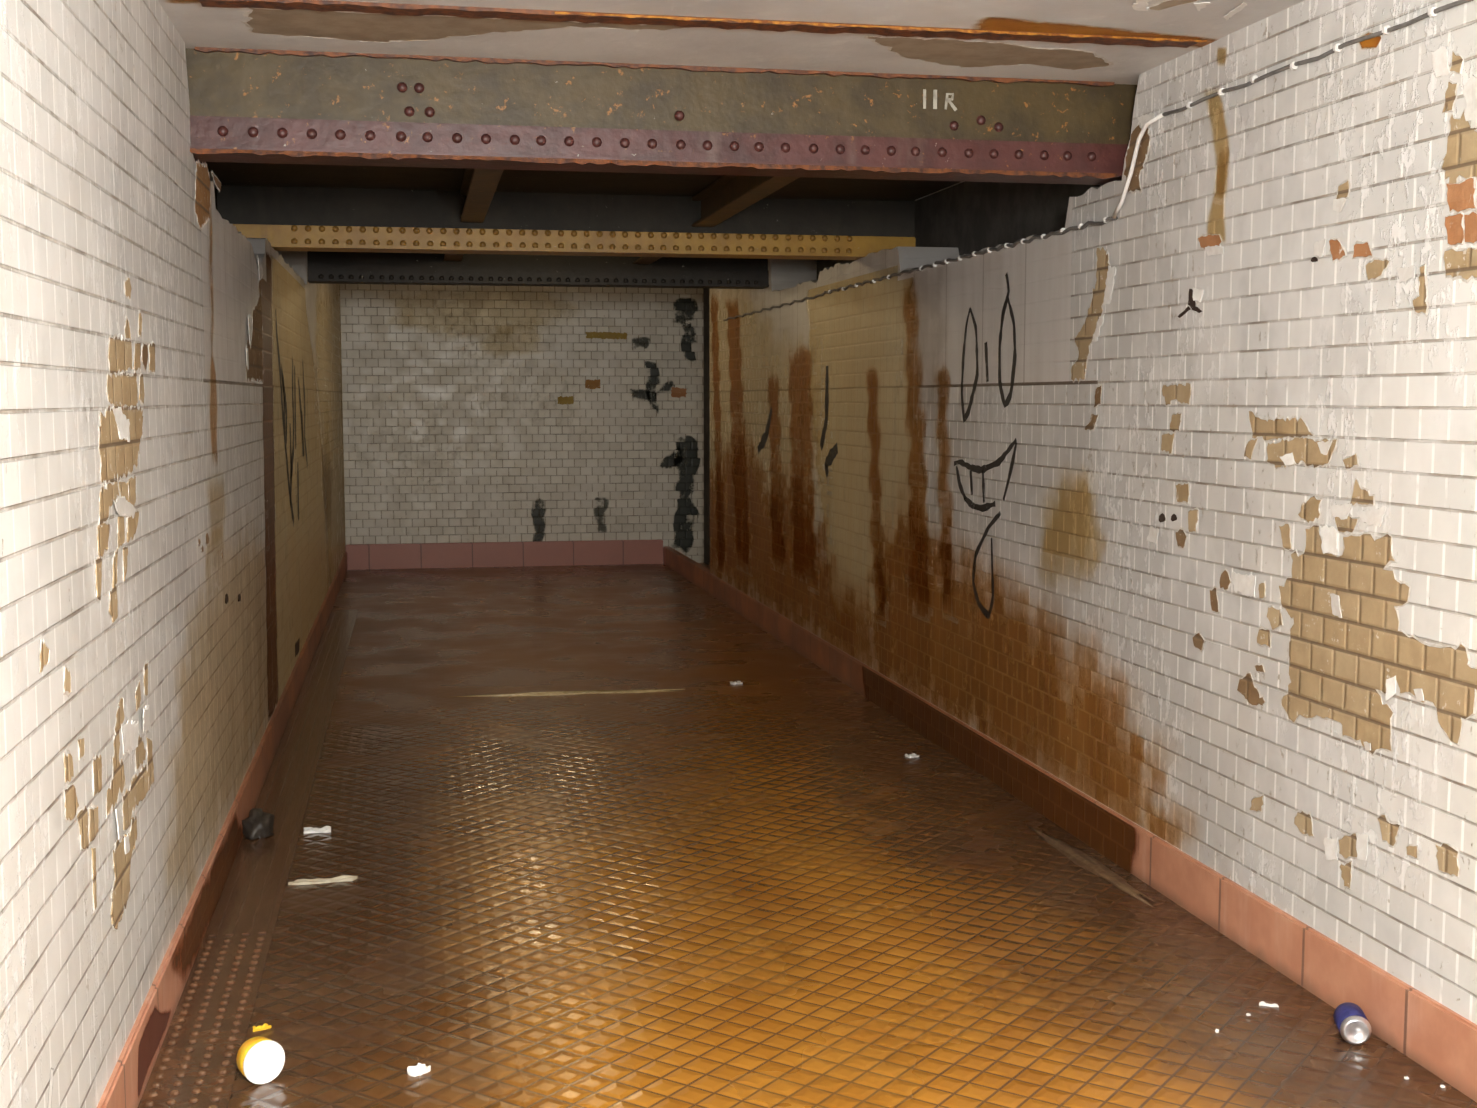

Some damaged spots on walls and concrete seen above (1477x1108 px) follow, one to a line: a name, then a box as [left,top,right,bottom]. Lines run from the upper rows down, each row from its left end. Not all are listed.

rust [555,12,1214,47]
rust [195,47,1115,87]
rust [190,148,1118,179]
peeling [1311,47,1477,316]
spalling [1197,233,1224,256]
peeling [94,275,155,625]
flaking render [671,387,687,398]
peeling [1161,381,1192,456]
peeling [1146,482,1199,549]
peeling [1210,410,1477,756]
peeling [1192,631,1206,653]
peeling [62,660,155,931]